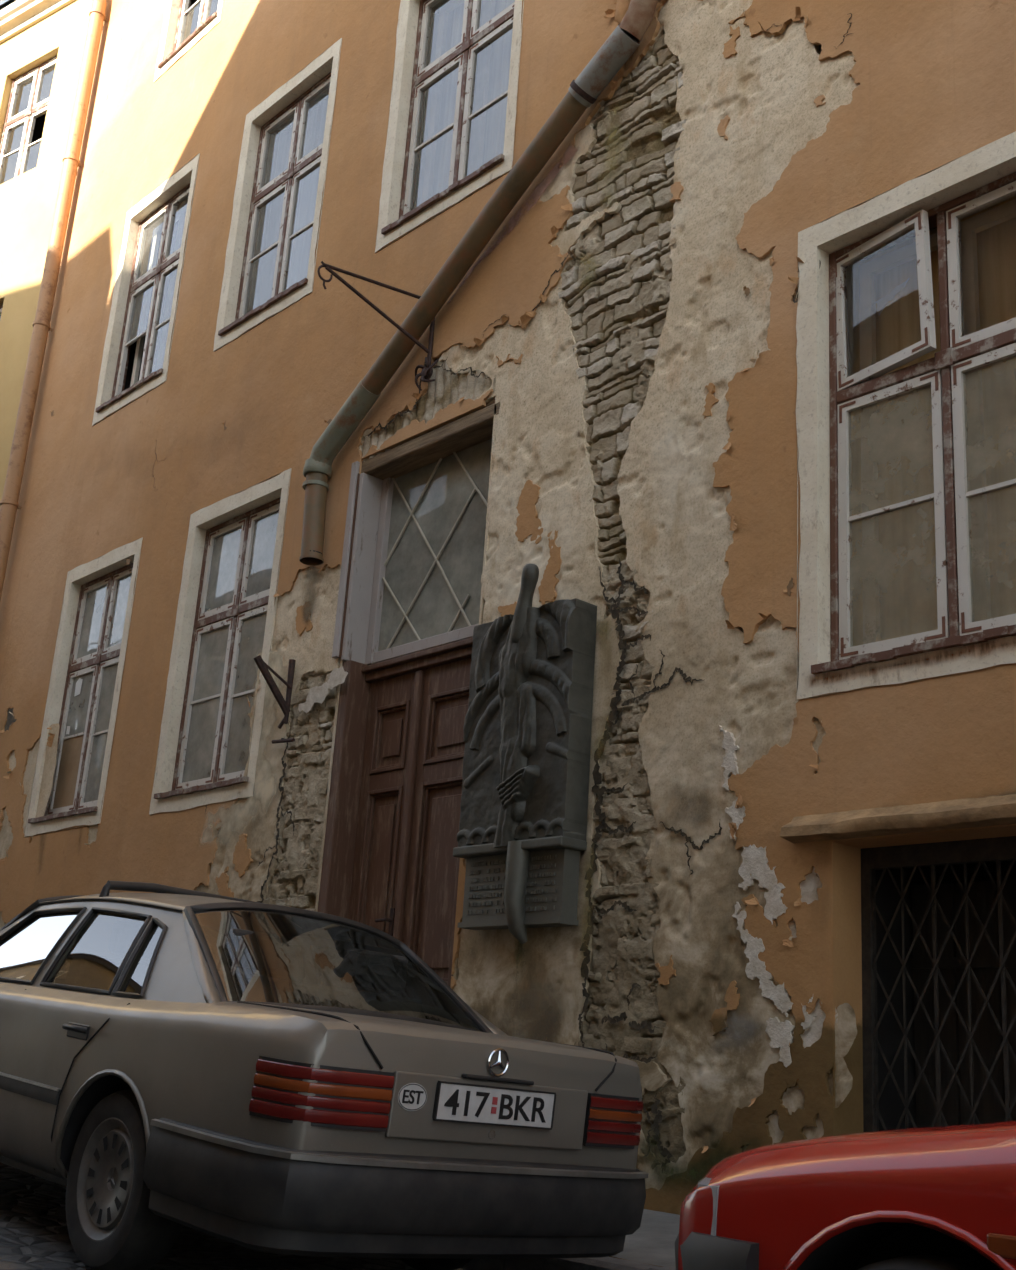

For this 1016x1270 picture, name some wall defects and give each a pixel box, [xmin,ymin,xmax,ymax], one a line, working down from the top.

flaking render [0,707,17,733]
flaking render [0,723,60,861]
flaking render [194,563,348,911]
flaking render [359,0,860,1190]
crack [578,558,722,1063]
crack [643,1093,672,1163]